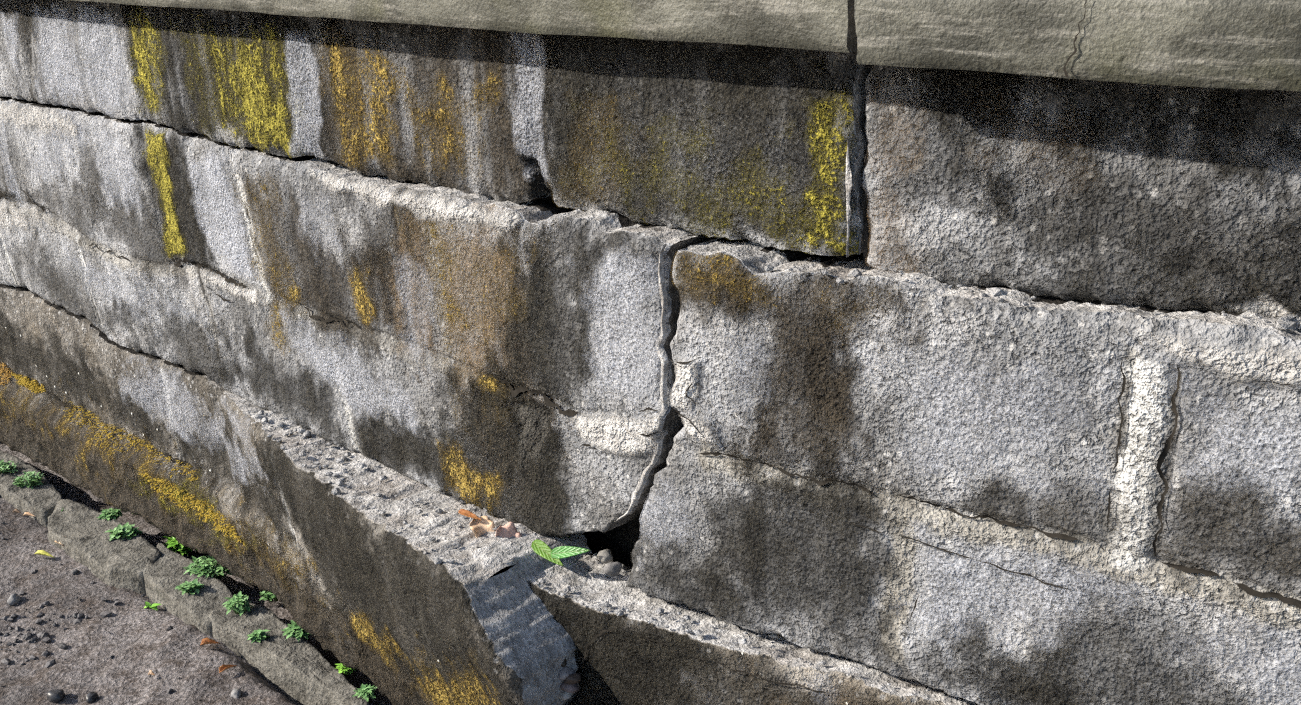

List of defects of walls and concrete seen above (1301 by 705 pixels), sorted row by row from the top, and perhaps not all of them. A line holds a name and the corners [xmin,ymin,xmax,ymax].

crack [1063,0,1087,77]
damp [396,67,501,174]
damp [933,69,1168,155]
damp [1191,88,1291,183]
damp [191,153,251,274]
crack [500,244,1133,551]
crack [844,520,1072,590]
damp [963,479,1089,537]
crack [1152,365,1301,609]
damp [1162,473,1301,579]
crack [582,628,832,694]